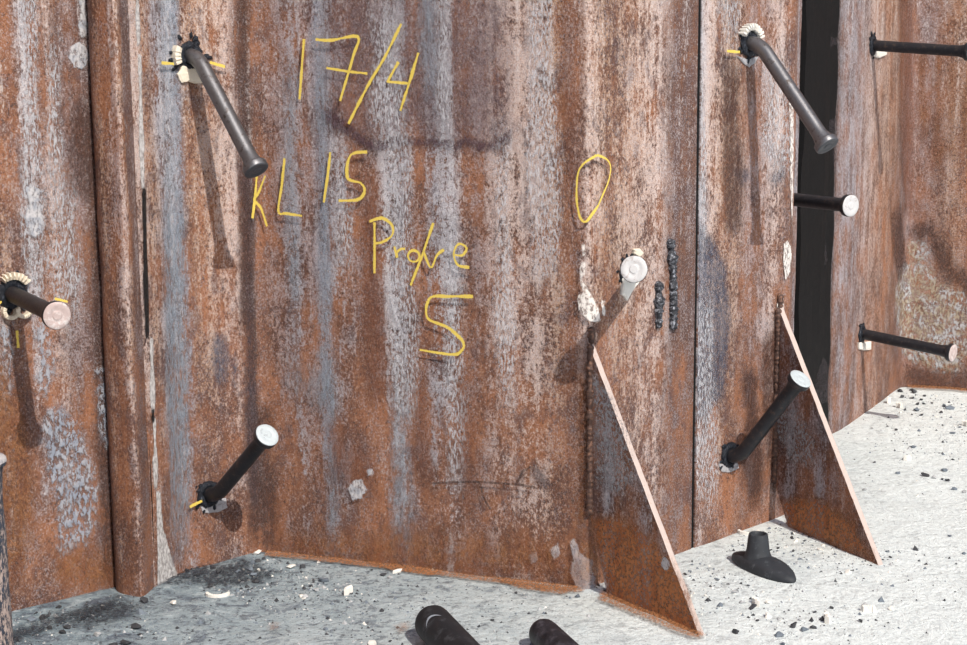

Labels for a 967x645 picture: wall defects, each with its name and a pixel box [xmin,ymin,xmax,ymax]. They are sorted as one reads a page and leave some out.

rust [781,498,874,561]
rust [264,550,584,594]
rust [593,516,704,636]